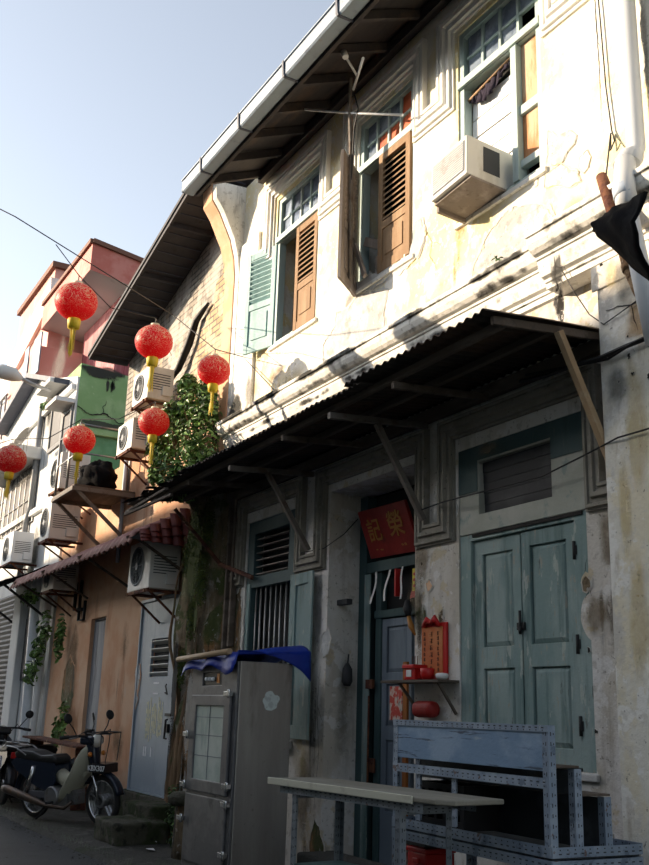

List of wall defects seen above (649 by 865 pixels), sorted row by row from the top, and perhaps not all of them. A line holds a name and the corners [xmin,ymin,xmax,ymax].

flaking render [544,130,592,189]
flaking render [472,202,555,277]
flaking render [322,216,426,362]
damp [469,250,525,298]
damp [551,255,564,322]
damp [295,342,366,405]
damp [602,520,610,561]
damp [588,593,613,630]
damp [166,643,192,776]